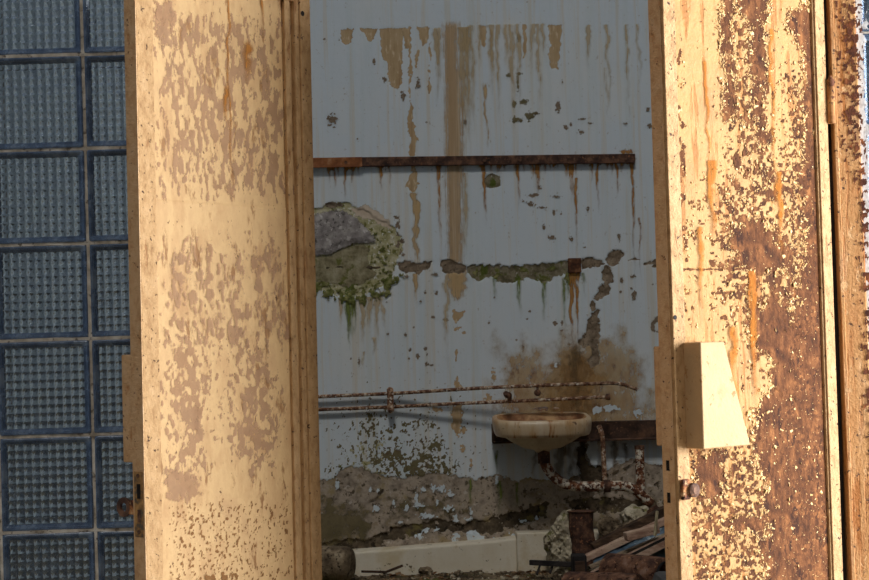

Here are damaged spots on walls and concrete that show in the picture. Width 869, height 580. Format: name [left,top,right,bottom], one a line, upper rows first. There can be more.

spalling [314,202,568,297]
rust [678,0,829,580]
rust [835,0,869,412]
rust [167,495,294,580]
water stain [321,495,371,546]
water stain [324,391,486,499]
water stain [388,492,469,517]
spalling [320,404,664,548]